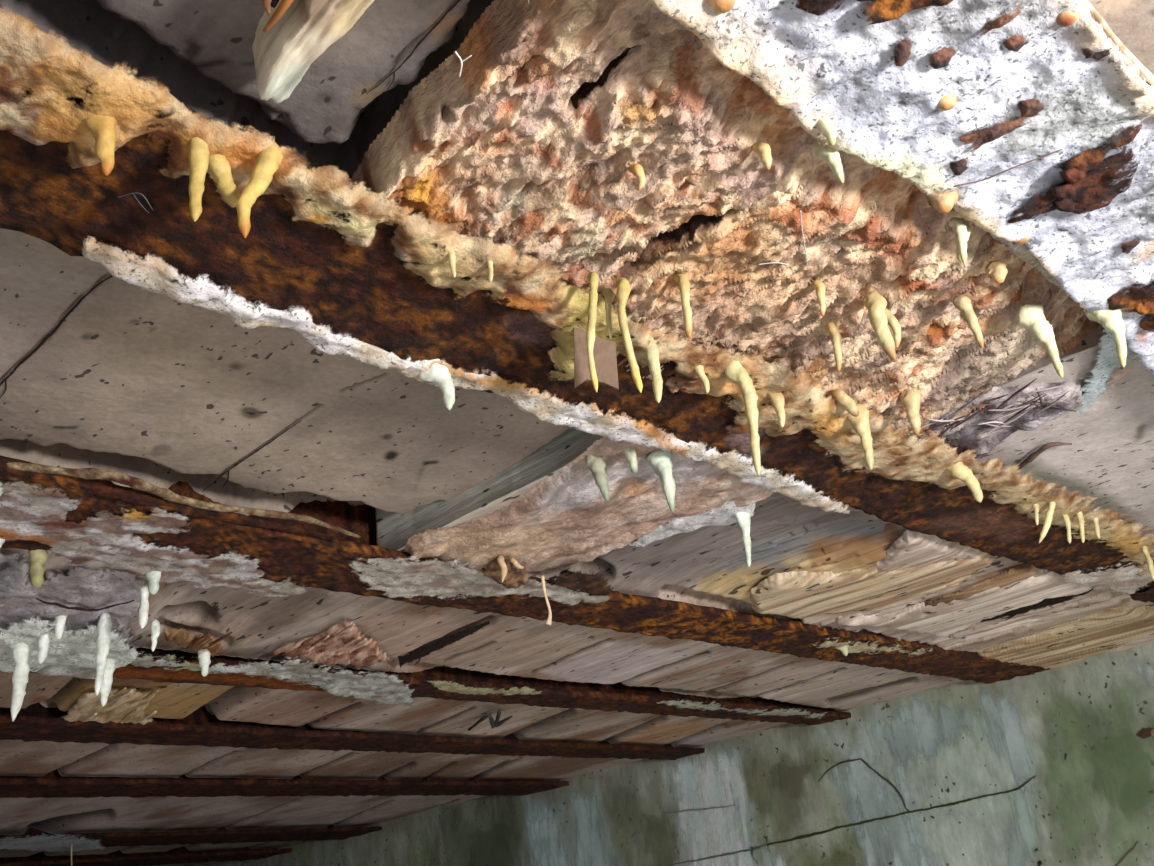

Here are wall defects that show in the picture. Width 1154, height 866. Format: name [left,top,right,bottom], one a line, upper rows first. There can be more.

spalling [252,0,374,103]
rust [795,0,953,25]
rust [1008,124,1142,223]
spalling [350,0,1099,459]
damp [0,0,1154,595]
rust [1108,285,1154,332]
rust [7,462,361,540]
damp [0,481,415,722]
damp [350,553,611,606]
spalling [749,530,1154,669]
damp [665,753,786,866]
crack [663,758,1036,866]